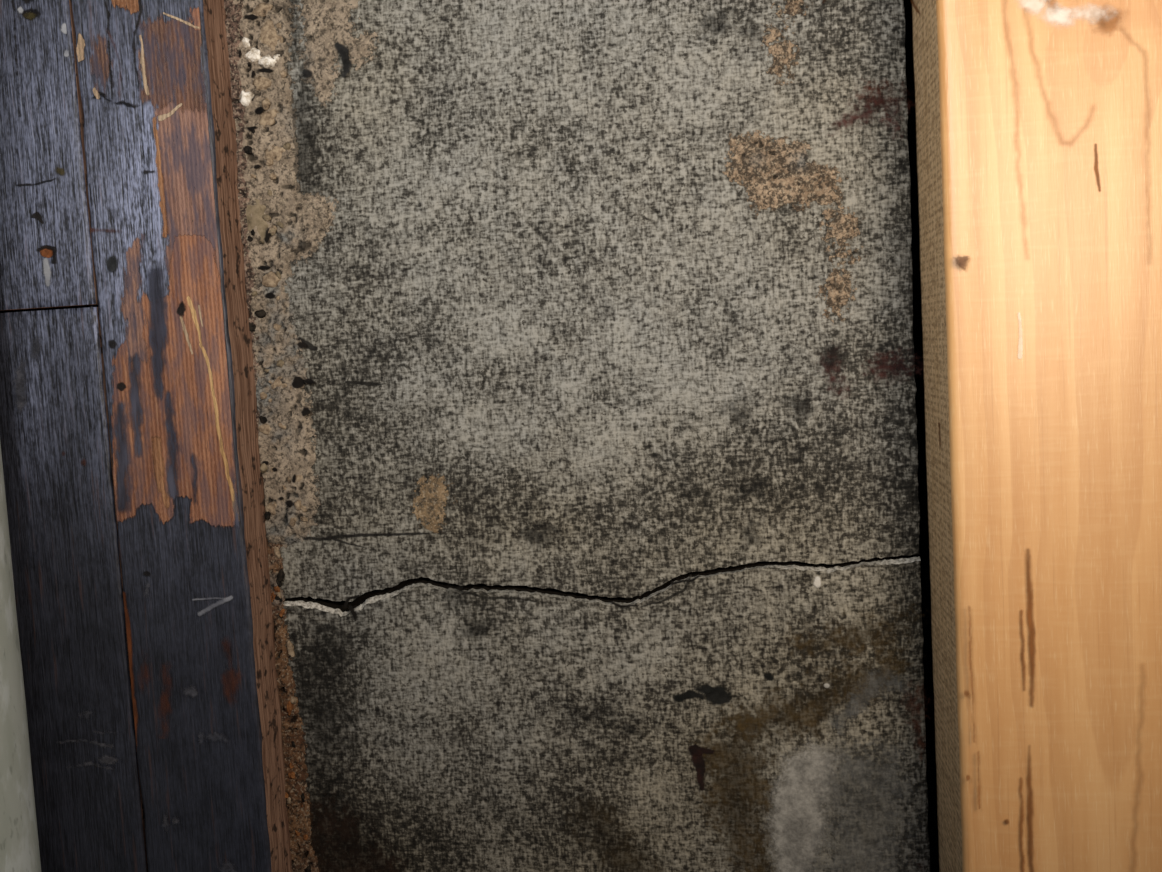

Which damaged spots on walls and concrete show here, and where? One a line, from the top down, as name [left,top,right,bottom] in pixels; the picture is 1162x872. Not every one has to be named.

peeling [111,16,239,527]
crack [302,532,440,548]
crack [283,554,921,620]
water stain [673,685,731,705]
water stain [688,655,904,872]